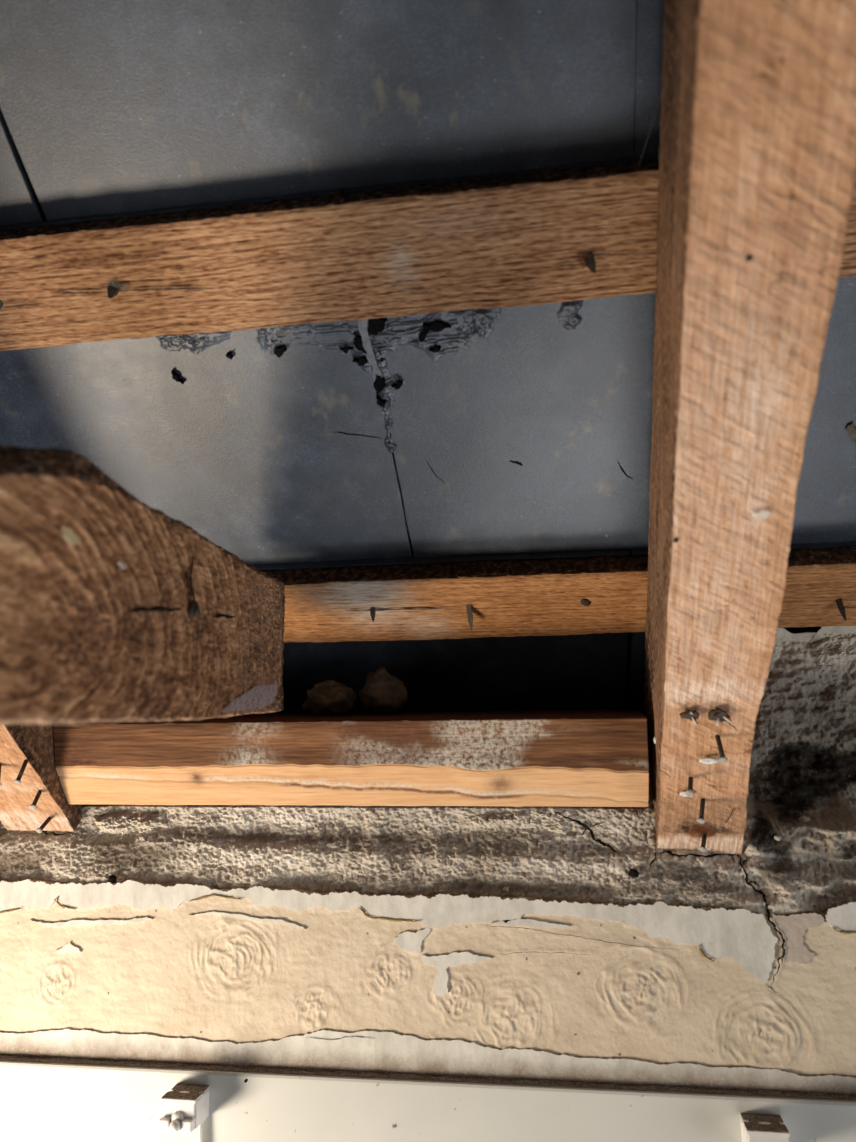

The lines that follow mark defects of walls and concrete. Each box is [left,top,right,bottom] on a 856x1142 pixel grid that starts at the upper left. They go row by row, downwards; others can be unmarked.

spalling [156,332,233,360]
spalling [255,307,502,453]
spalling [557,300,583,330]
crack [553,810,619,853]
water stain [748,743,856,884]
peeling [0,879,856,996]
crack [649,848,785,993]
peeling [0,1028,856,1095]